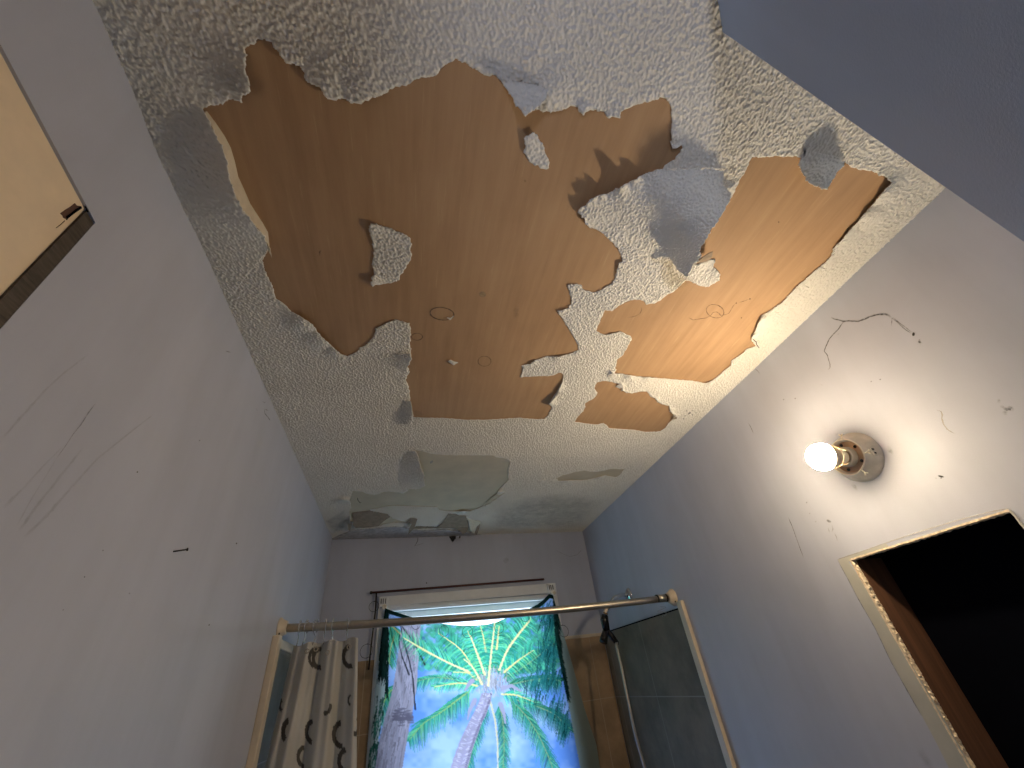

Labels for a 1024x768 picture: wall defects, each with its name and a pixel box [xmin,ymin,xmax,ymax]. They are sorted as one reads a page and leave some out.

peeling [102,21,891,432]
crack [824,313,915,363]
peeling [348,450,510,542]
peeling [537,469,624,483]